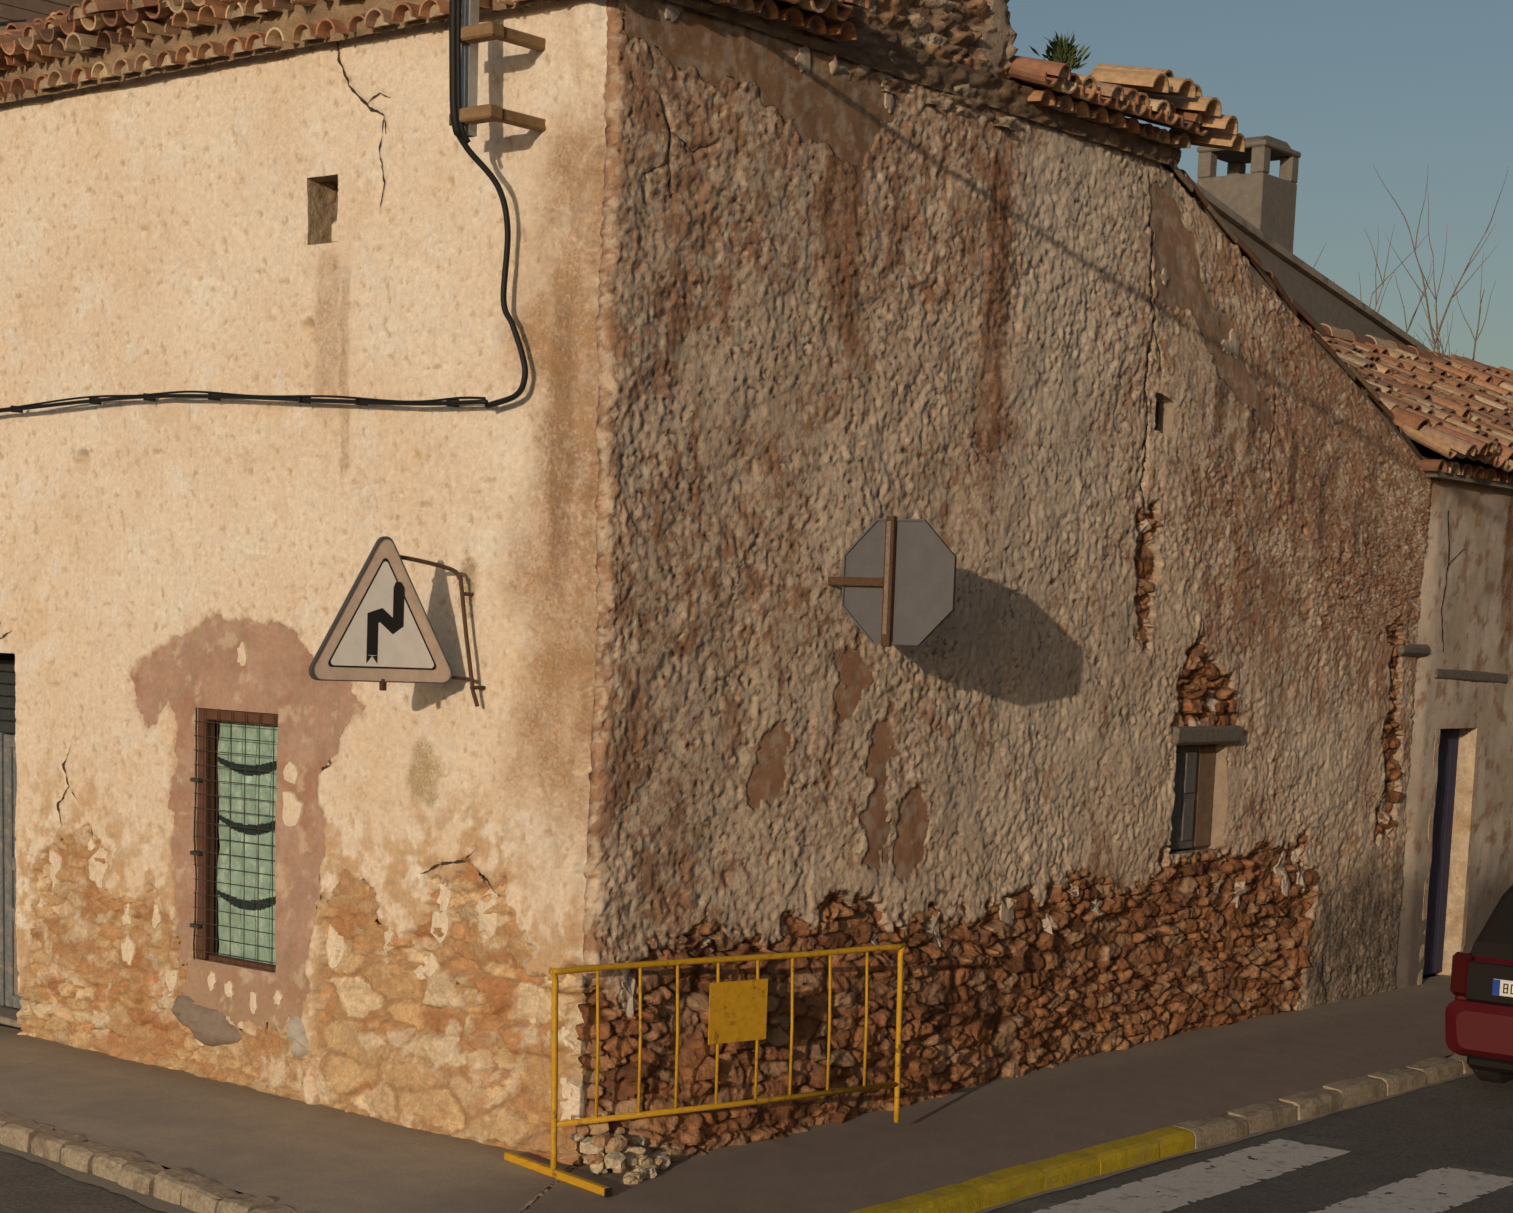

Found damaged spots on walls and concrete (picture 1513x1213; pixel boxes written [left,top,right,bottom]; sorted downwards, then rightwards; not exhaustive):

crack [336,41,391,214]
crack [1139,175,1162,512]
spalling [1134,503,1162,650]
spalling [1374,621,1409,841]
spalling [16,615,1320,1166]